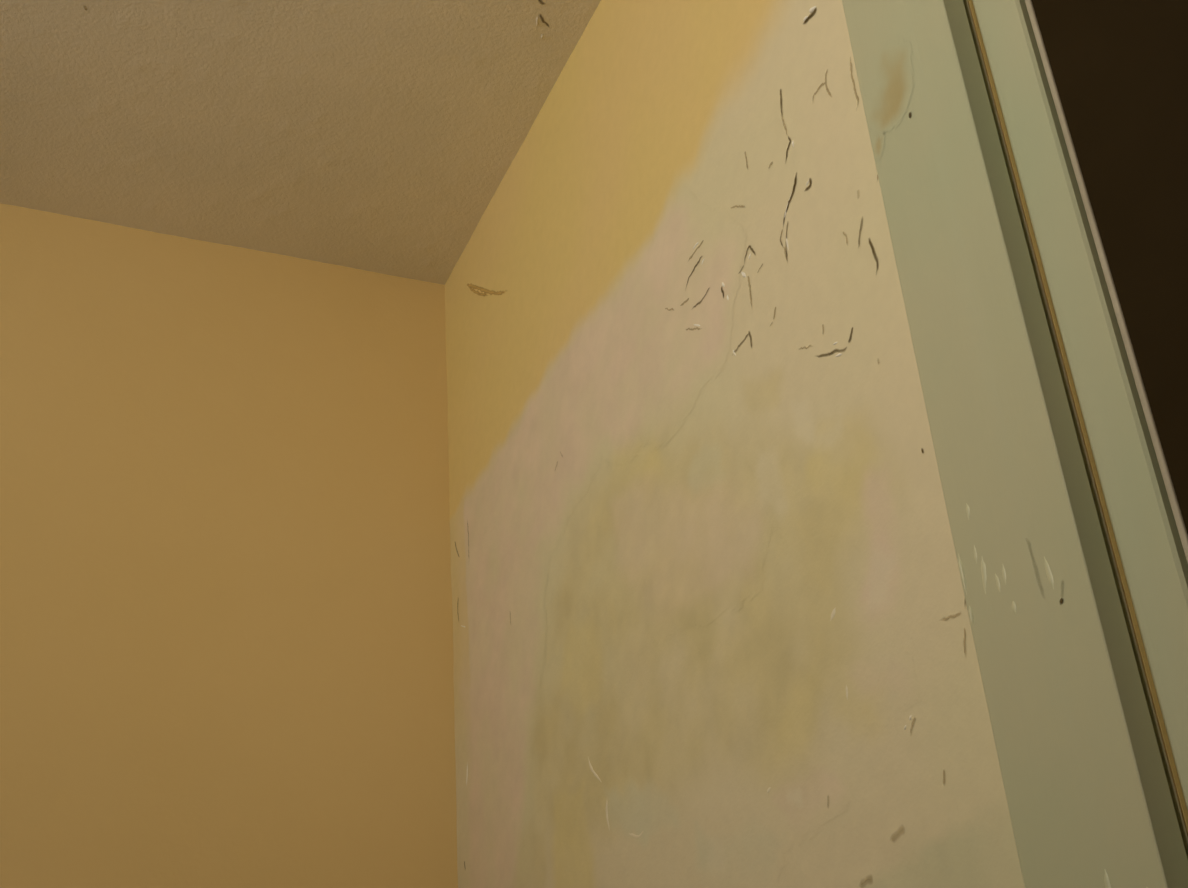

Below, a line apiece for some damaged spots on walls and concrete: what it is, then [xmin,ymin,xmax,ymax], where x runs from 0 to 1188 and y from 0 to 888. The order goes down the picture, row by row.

crack [813,63,859,104]
crack [733,90,811,356]
crack [844,221,878,269]
crack [666,241,708,330]
crack [803,325,853,357]